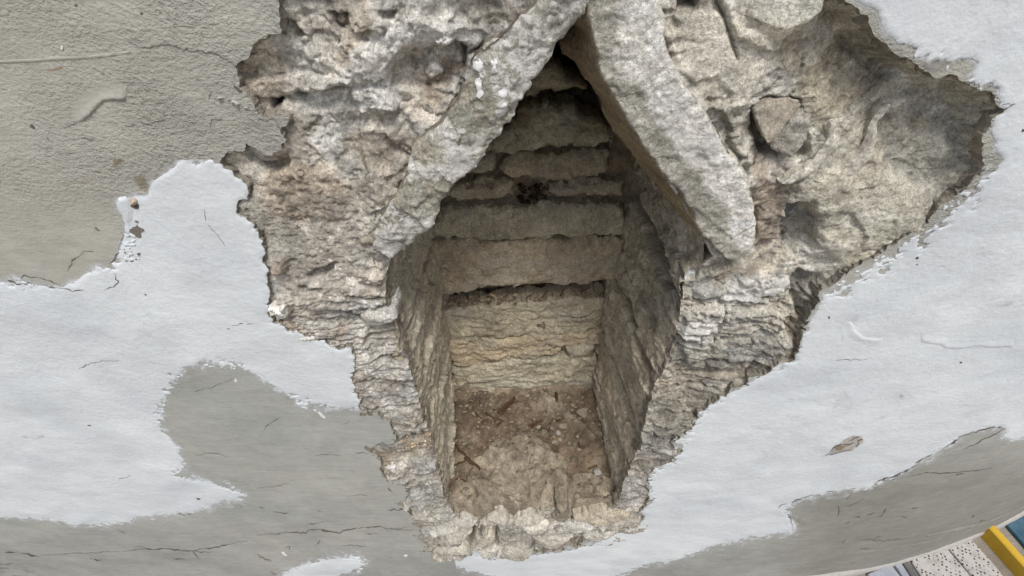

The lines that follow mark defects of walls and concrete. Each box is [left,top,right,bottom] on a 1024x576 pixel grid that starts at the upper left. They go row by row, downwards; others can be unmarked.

peeling [0,159,361,530]
crack [0,476,413,575]
spalling [225,0,1024,576]